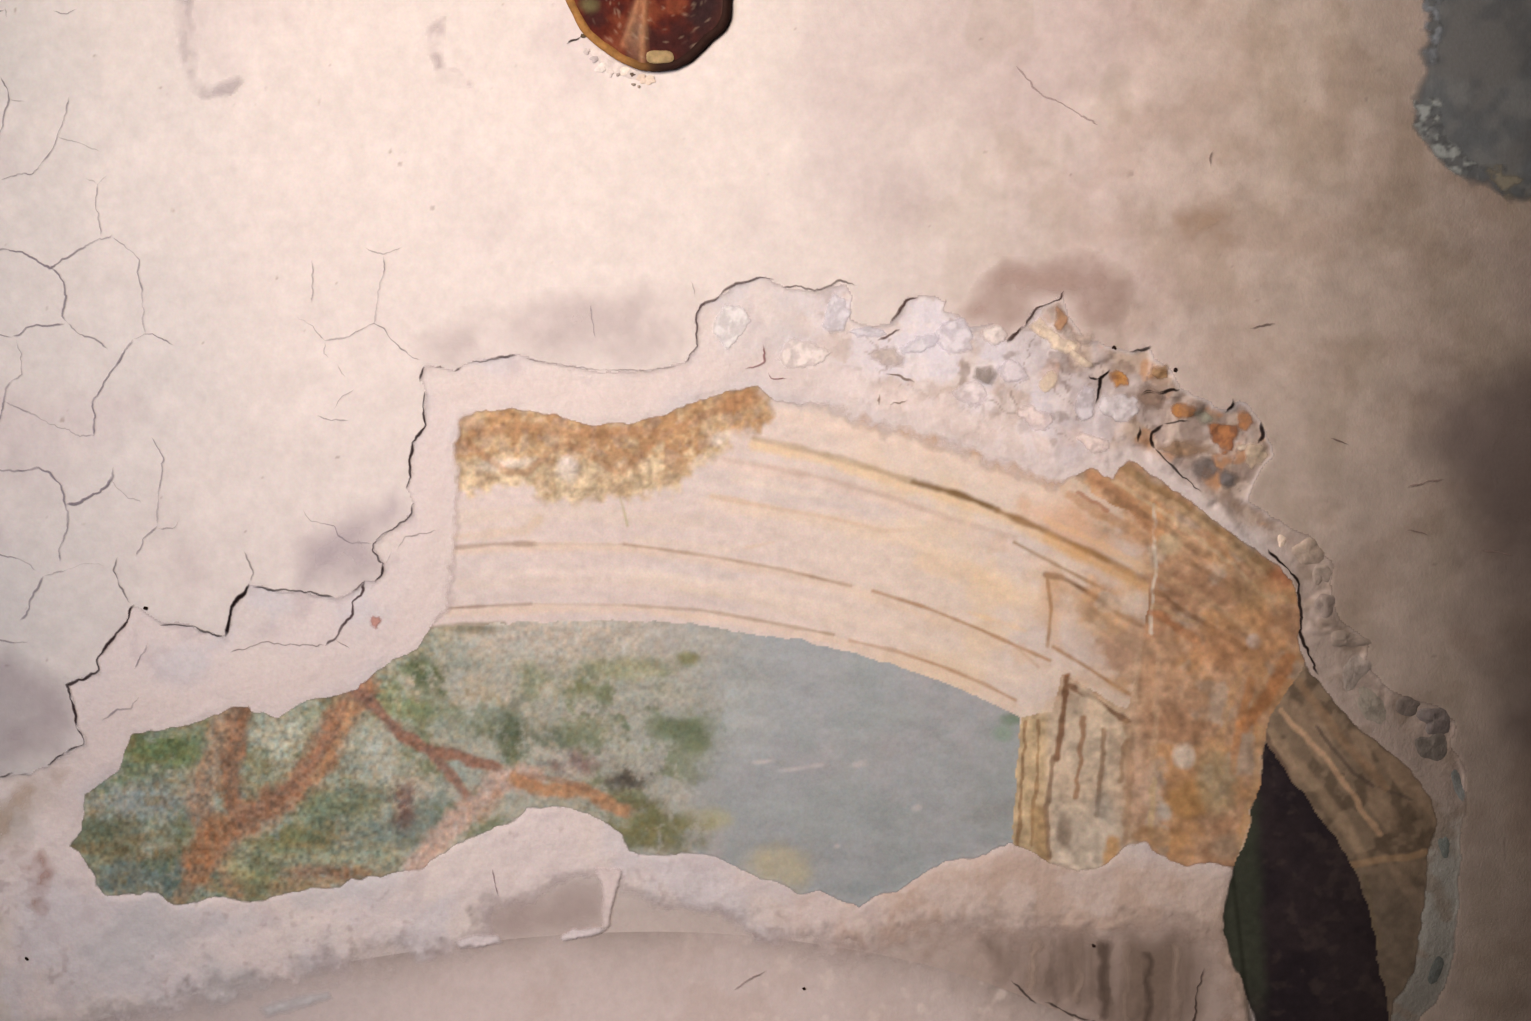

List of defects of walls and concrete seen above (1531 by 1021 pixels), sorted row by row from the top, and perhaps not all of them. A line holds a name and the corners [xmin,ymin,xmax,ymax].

spalling [580,34,656,88]
crack [0,193,168,434]
crack [17,468,111,618]
crack [48,323,459,765]
spalling [0,278,1466,1021]
crack [1016,984,1086,1020]
crack [1192,972,1203,1021]